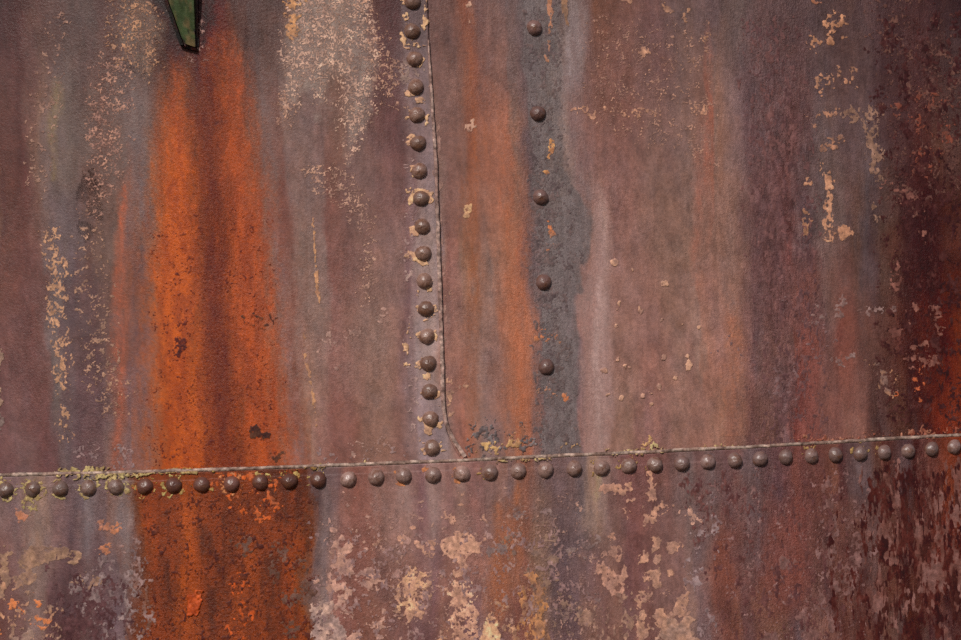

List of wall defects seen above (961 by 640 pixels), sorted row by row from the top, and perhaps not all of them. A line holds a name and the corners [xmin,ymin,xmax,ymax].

peeling [38,0,287,470]
rust [105,0,319,640]
peeling [273,0,469,464]
rust [451,0,548,637]
rust [712,283,756,437]
peeling [802,134,854,243]
rust [782,206,961,446]
peeling [804,0,961,224]
peeling [0,452,961,640]